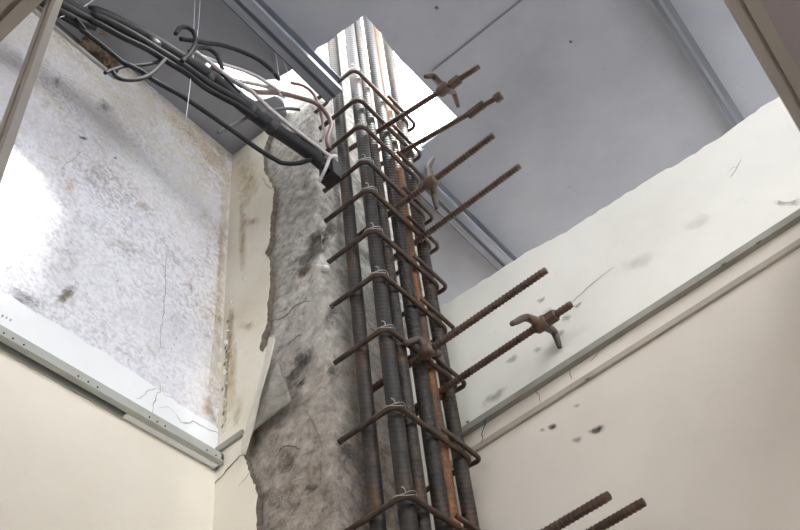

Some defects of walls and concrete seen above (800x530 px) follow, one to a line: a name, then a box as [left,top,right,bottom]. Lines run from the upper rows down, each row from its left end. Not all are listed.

crack [159,248,167,348]
spalling [296,15,480,530]
crack [138,388,219,434]